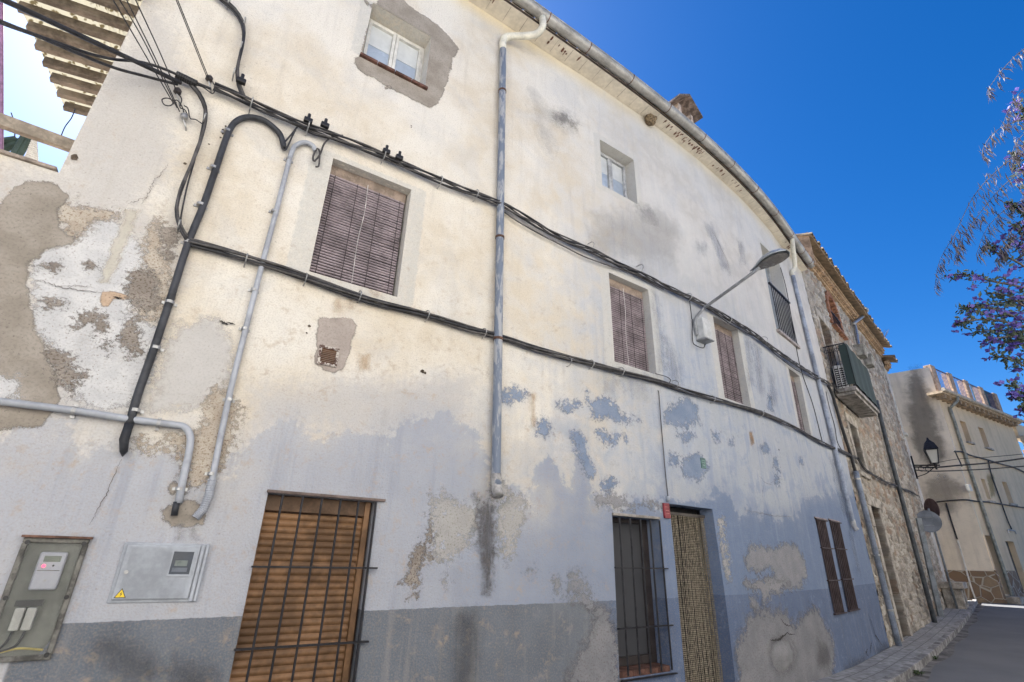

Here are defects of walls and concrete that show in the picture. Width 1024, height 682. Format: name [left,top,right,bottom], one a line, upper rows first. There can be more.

peeling [0,373,23,400]
peeling [29,202,245,492]
peeling [502,386,528,405]
peeling [536,418,552,438]
peeling [555,390,663,512]
peeling [663,397,709,482]
leakage [911,377,943,462]
peeling [397,494,480,601]
leakage [471,504,495,593]
spalling [718,519,835,682]